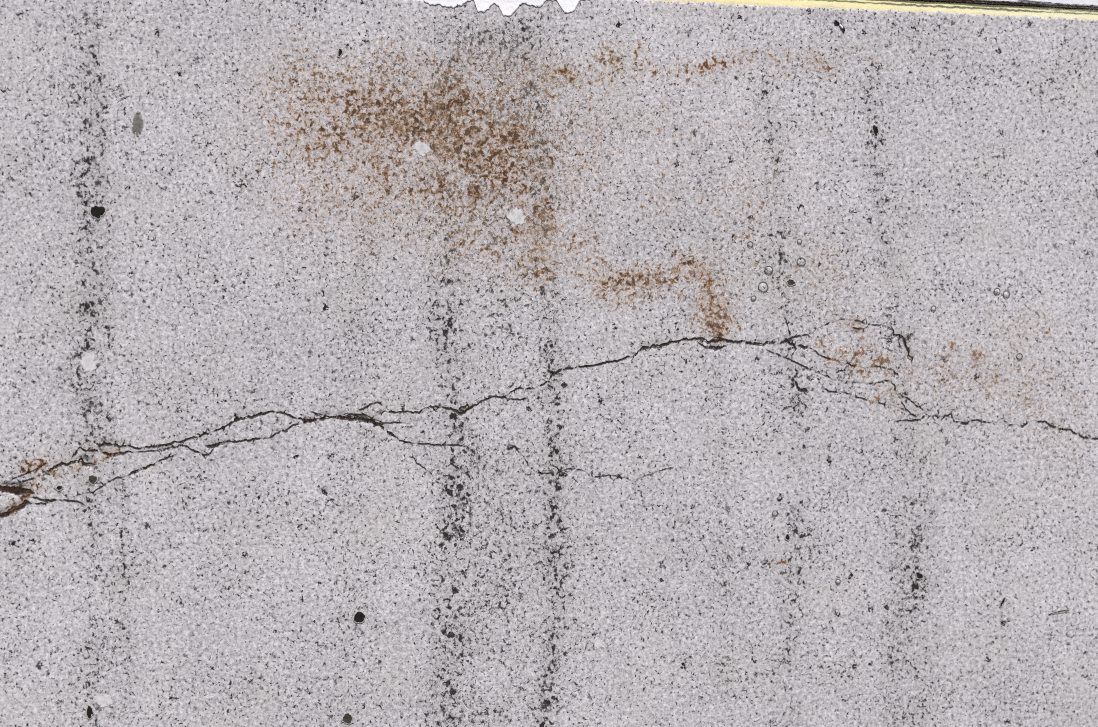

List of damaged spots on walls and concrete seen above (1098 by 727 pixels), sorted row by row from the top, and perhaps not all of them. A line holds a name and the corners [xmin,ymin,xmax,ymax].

crack [0,314,1098,517]
corrosion [237,35,1096,460]